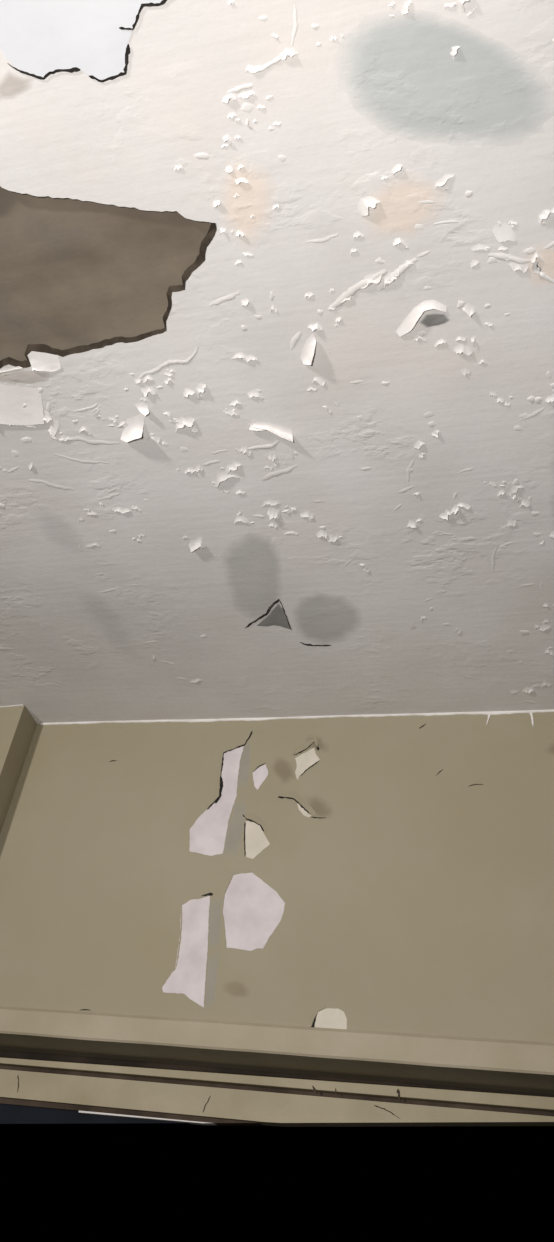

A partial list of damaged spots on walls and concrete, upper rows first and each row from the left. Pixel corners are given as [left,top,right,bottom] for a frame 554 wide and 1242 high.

peeling [194,4,344,159]
leakage [334,10,554,147]
peeling [358,196,380,216]
peeling [470,220,554,283]
spalling [0,165,250,490]
peeling [290,237,430,391]
peeling [176,389,299,494]
peeling [234,499,343,542]
peeling [439,492,471,520]
leakage [220,532,364,648]
peeling [162,731,326,1008]
peeling [308,1005,347,1029]